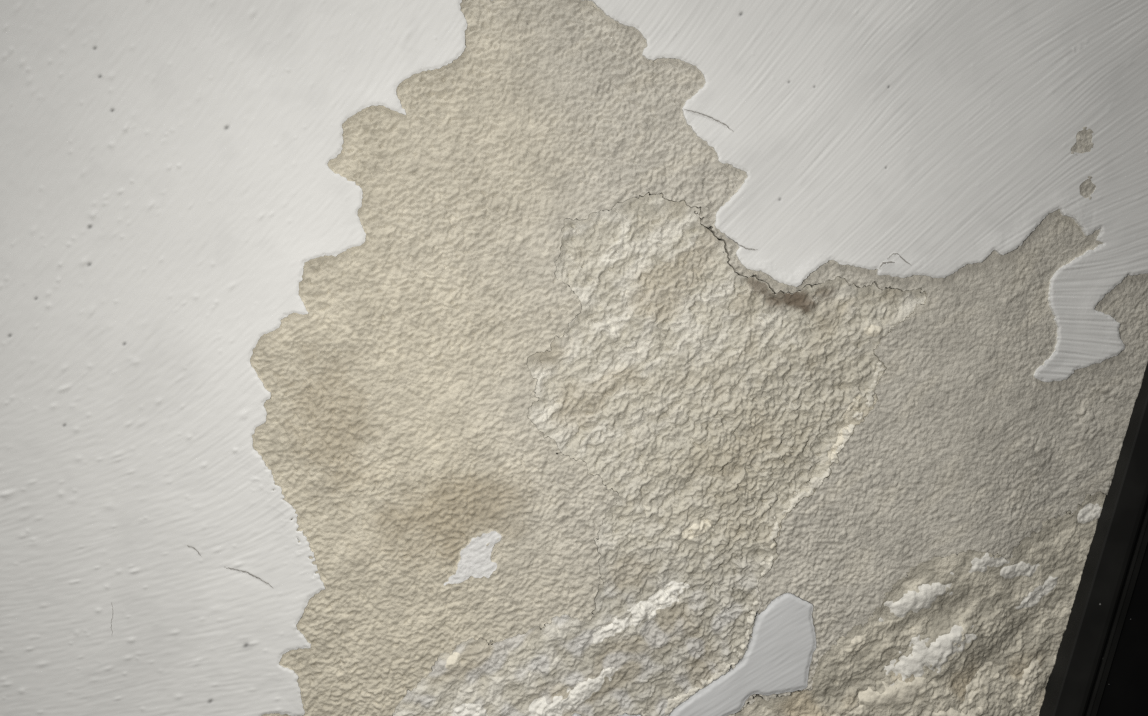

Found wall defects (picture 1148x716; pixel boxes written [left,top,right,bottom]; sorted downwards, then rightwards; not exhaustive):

peeling [250,0,1148,716]